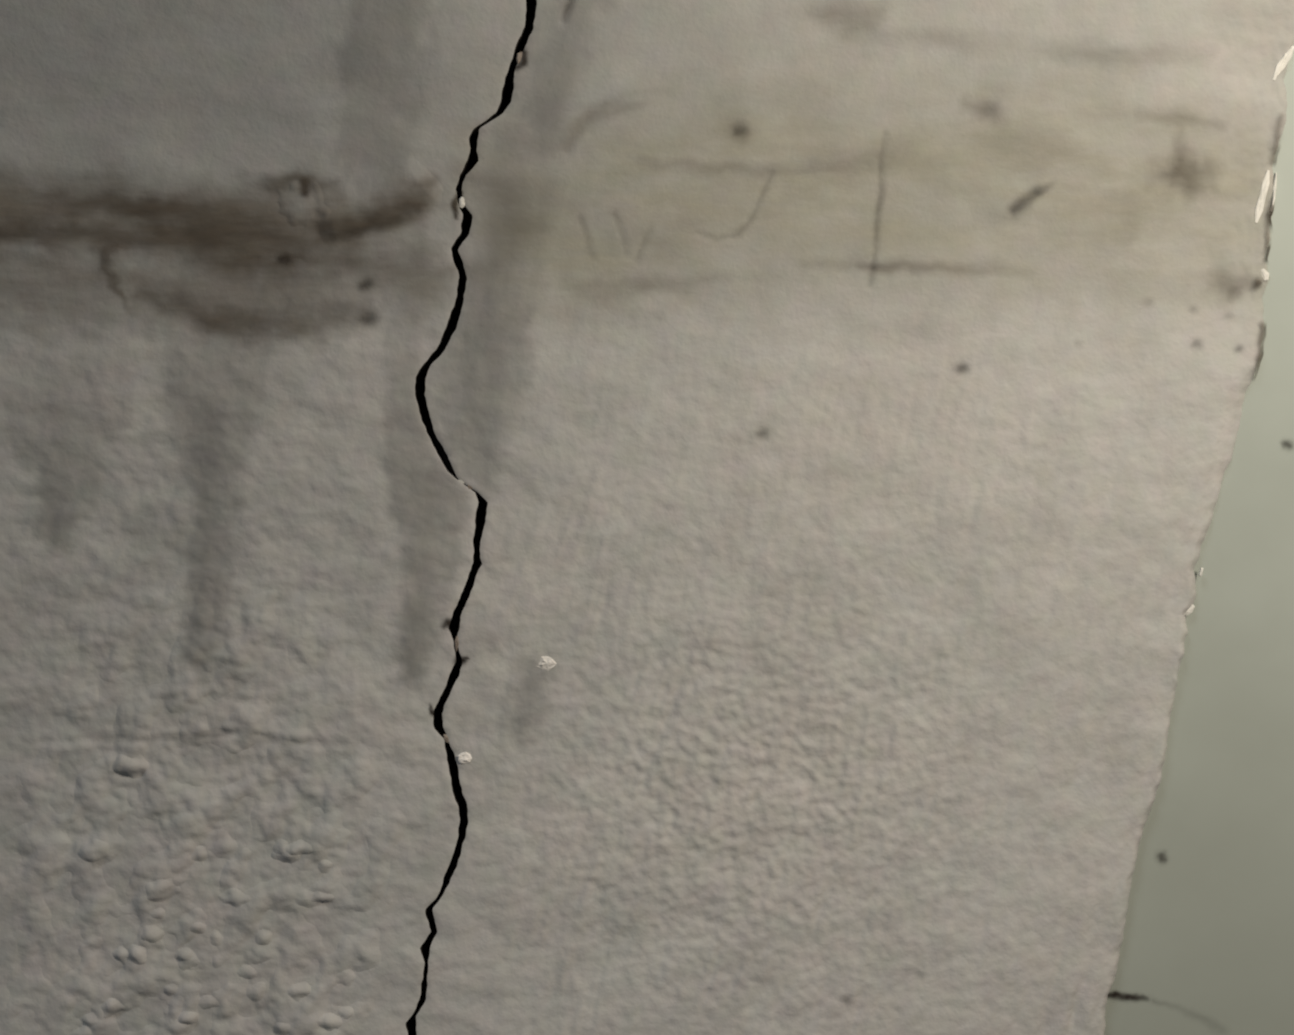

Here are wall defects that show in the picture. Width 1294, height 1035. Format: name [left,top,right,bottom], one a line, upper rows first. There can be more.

crack [406,0,537,1035]